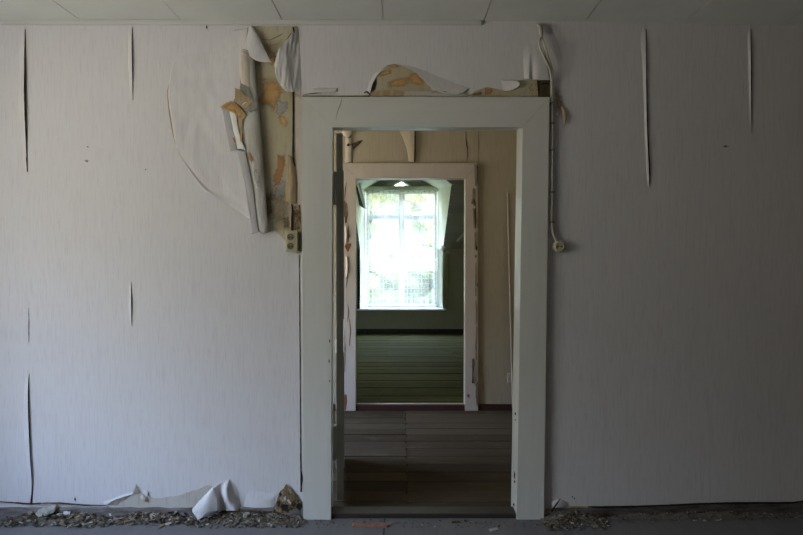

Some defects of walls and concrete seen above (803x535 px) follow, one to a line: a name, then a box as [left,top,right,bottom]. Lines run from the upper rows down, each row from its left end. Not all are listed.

crack [18,29,28,172]
crack [126,27,134,98]
flaking render [248,26,302,254]
flaking render [468,79,538,97]
crack [641,29,650,187]
crack [746,28,754,130]
crack [126,282,134,324]
crack [0,374,106,506]
flaking render [106,485,213,508]
crack [216,507,272,515]
spalling [273,484,303,513]